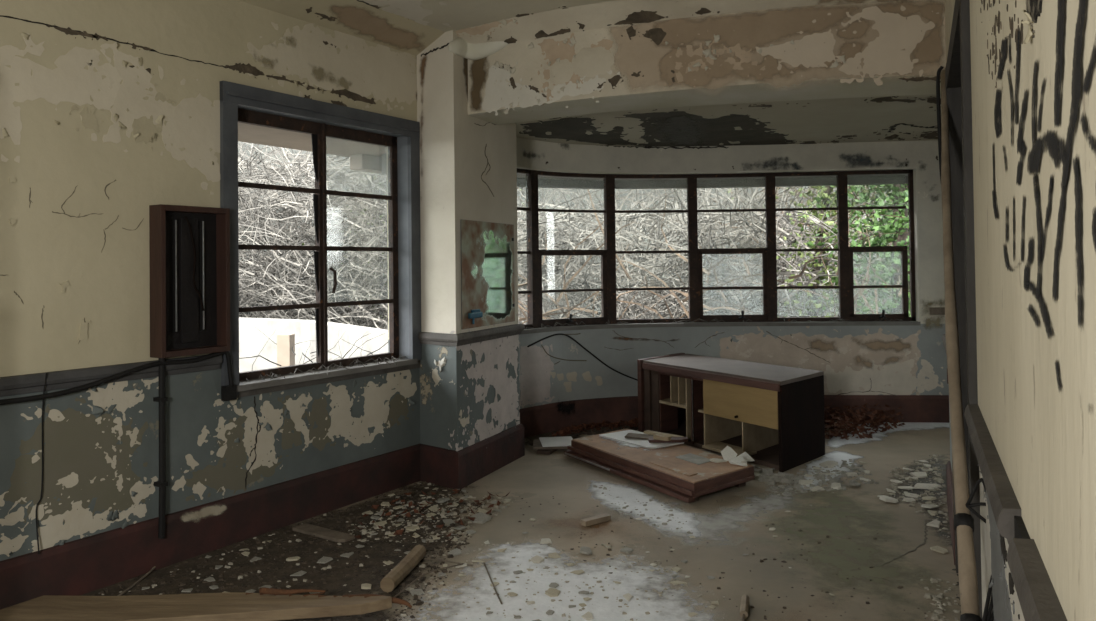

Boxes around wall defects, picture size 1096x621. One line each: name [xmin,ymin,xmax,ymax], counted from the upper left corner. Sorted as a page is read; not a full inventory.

peeling [0,24,220,195]
crack [0,15,229,68]
peeling [225,7,417,111]
crack [474,122,495,196]
spalling [480,21,817,147]
peeling [591,6,945,111]
crack [605,330,724,350]
peeling [711,326,949,395]
peeling [0,377,159,557]
peeling [171,330,603,522]
spalling [362,495,511,543]
peeling [978,464,1020,621]